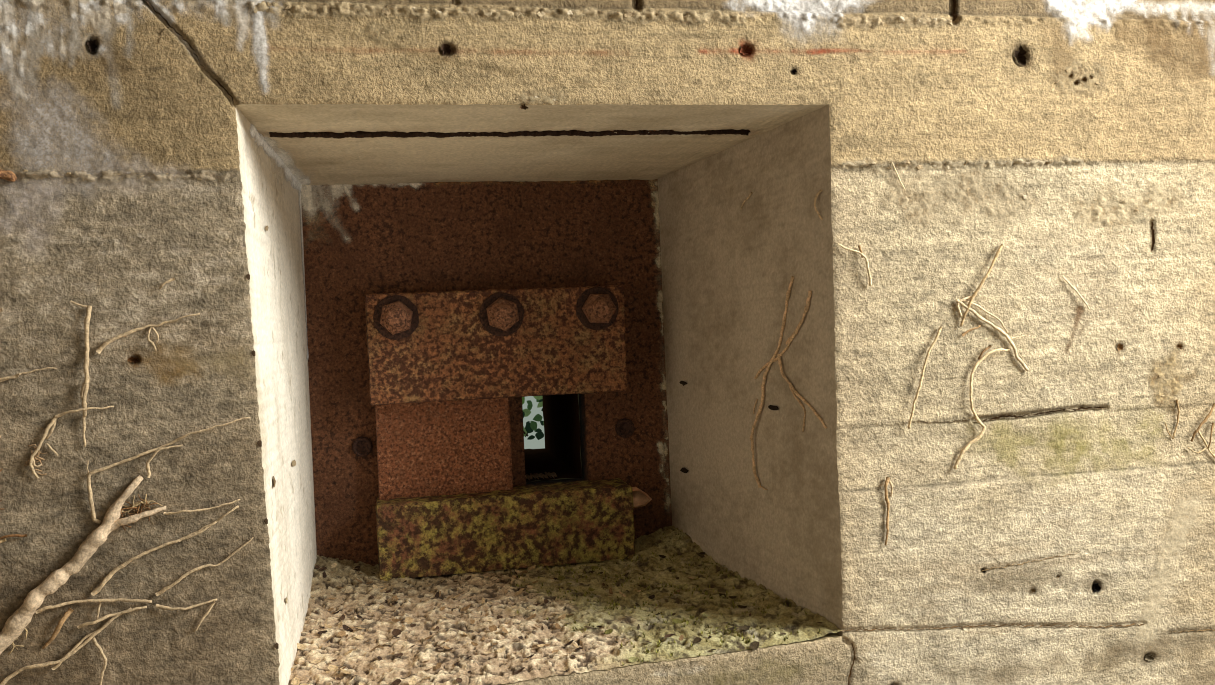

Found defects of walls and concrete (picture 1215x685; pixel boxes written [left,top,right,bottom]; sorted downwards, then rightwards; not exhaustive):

crack [145,0,234,104]
water stain [215,0,275,90]
water stain [731,0,859,34]
water stain [1046,0,1215,56]
water stain [0,0,132,172]
crack [269,129,750,139]
water stain [250,125,377,322]
crack [906,406,1106,423]
crack [844,621,1145,685]